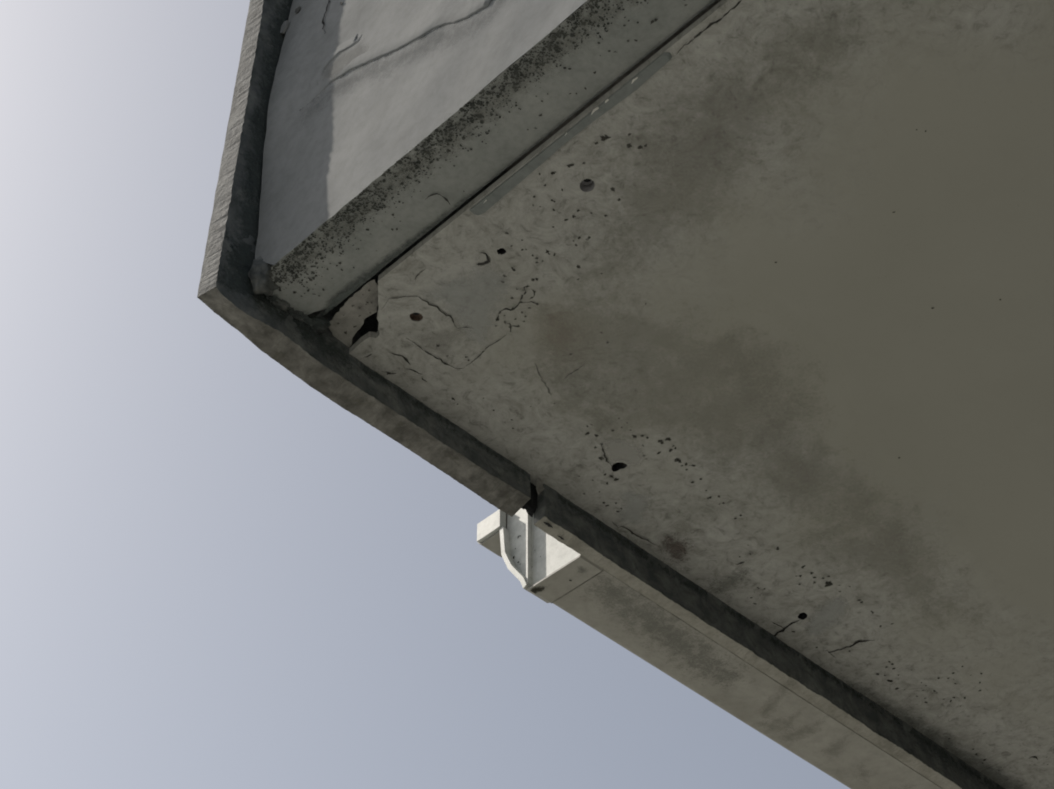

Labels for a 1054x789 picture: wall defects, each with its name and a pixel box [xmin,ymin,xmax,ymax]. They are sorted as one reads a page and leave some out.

leakage [221,0,648,381]
crack [391,269,471,329]
crack [406,286,539,369]